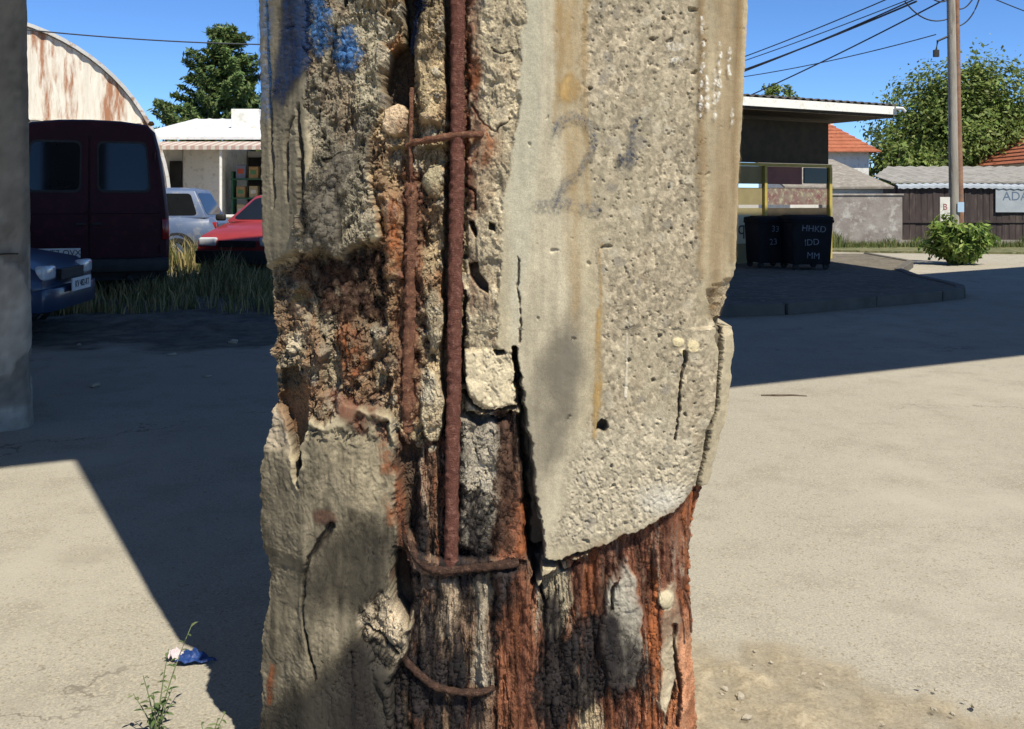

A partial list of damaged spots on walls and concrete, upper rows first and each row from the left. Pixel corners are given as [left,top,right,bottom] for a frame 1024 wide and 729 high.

rust [388,171,425,300]
crack [465,184,478,211]
rust [465,0,494,206]
spalling [261,0,734,729]
crack [461,257,621,629]
crack [648,316,728,526]
crack [302,522,336,679]
rust [577,488,697,729]